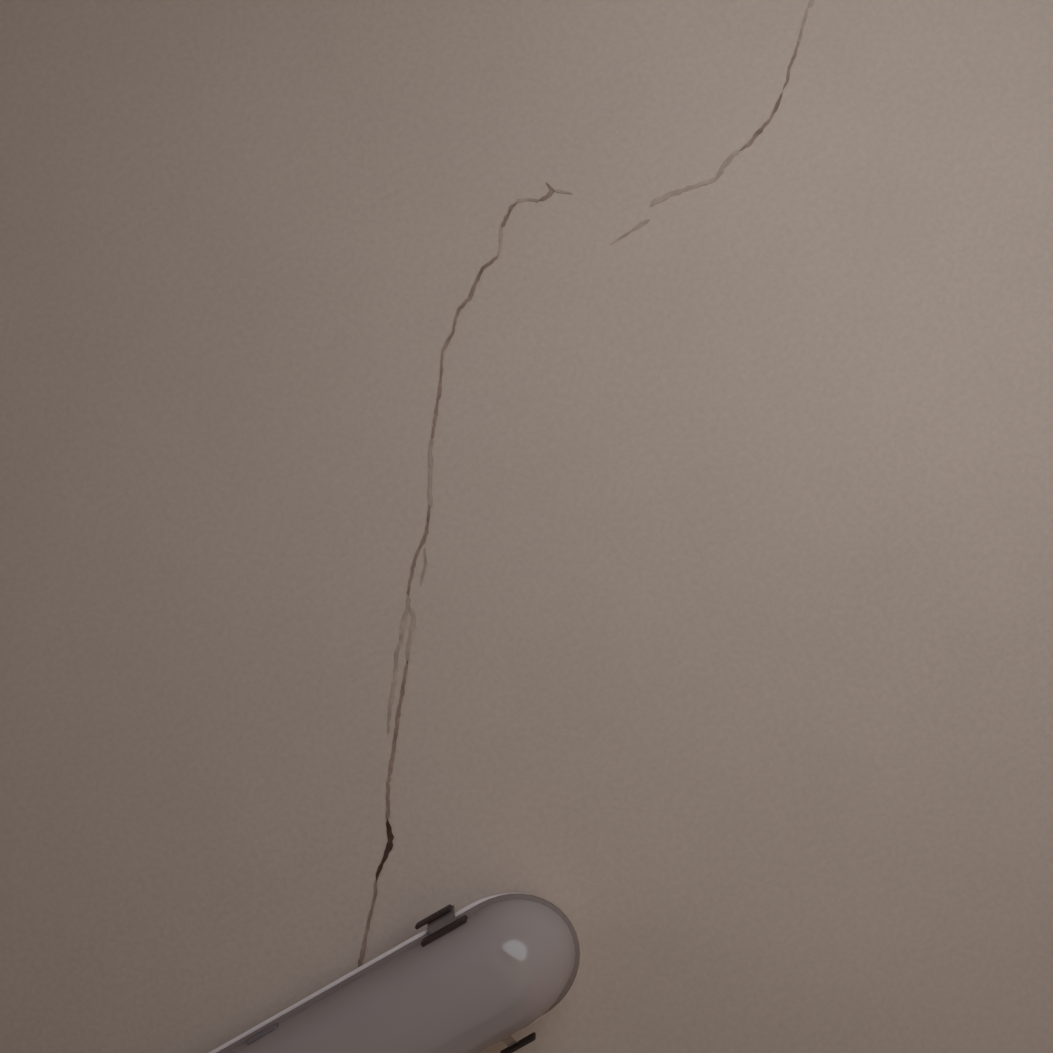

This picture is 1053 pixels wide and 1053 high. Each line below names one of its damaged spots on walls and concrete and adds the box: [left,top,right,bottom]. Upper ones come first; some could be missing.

crack [610,0,815,244]
crack [358,182,572,967]